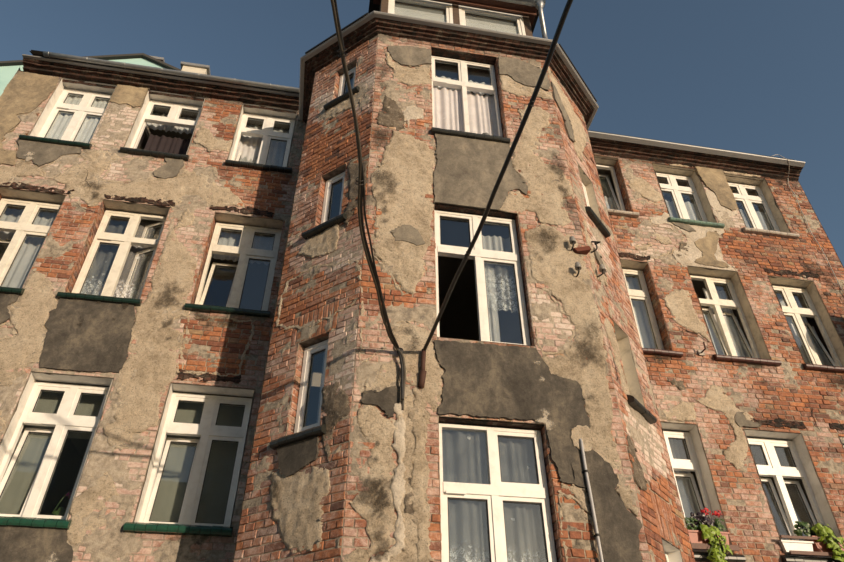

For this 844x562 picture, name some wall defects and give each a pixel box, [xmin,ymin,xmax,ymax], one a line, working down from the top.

peeling [384,45,432,86]
peeling [0,72,256,451]
peeling [628,164,761,272]
peeling [269,57,647,562]
peeling [663,287,710,342]
peeling [659,379,761,470]
peeling [0,471,119,562]